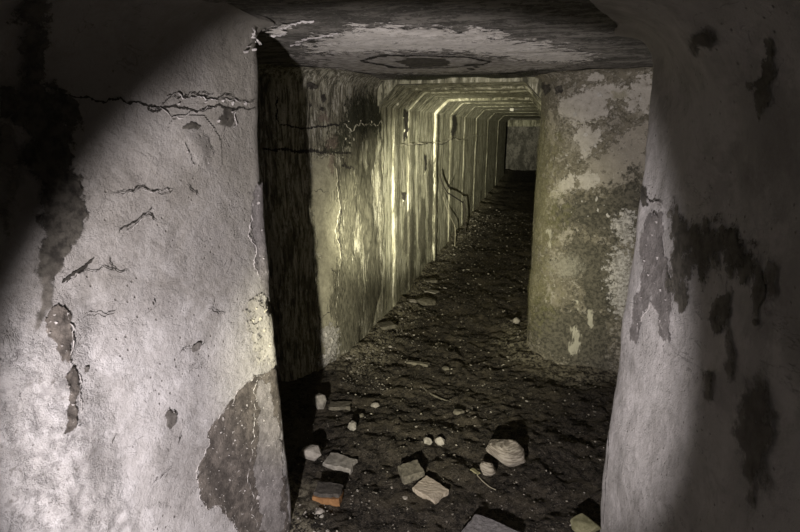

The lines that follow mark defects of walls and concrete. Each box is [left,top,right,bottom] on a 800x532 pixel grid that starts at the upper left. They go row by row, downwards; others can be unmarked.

water stain [0,0,90,329]
crack [62,258,127,284]
crack [113,184,197,232]
crack [65,92,382,159]
peeling [265,24,292,36]
peeling [288,22,673,371]
water stain [527,163,643,373]
water stain [664,197,777,380]
water stain [746,38,778,119]
peeling [44,305,89,434]
spalling [196,183,290,532]
water stain [733,375,776,508]